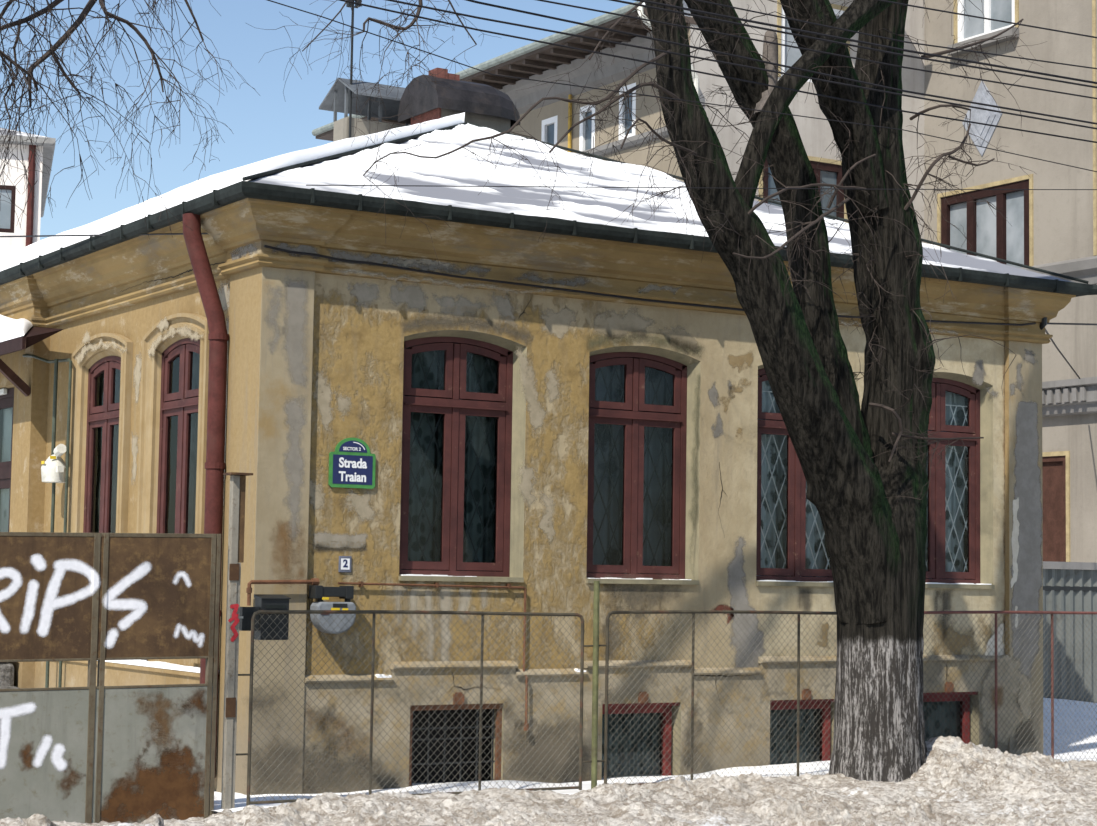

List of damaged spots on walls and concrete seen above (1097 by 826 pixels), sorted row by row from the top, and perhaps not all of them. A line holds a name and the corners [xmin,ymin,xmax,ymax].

peeling [314,371,351,430]
peeling [516,348,559,430]
peeling [708,353,753,438]
peeling [309,479,325,509]
peeling [346,490,375,521]
peeling [933,349,1042,678]
peeling [714,537,765,668]
corrosion [21,744,32,768]
corrosion [61,771,79,790]
corrosion [100,691,216,823]
water stain [255,743,396,795]